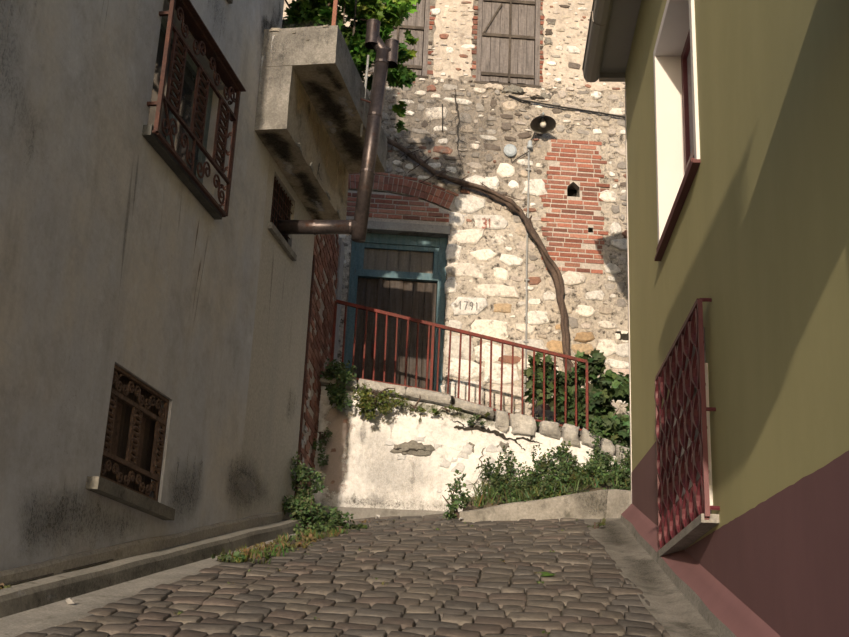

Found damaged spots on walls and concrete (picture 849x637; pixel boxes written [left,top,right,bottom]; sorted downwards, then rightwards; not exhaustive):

leakage [261,133,323,220]
spalling [384,436,442,460]
peeling [439,442,475,503]
peeling [483,441,509,477]
crack [452,420,542,487]